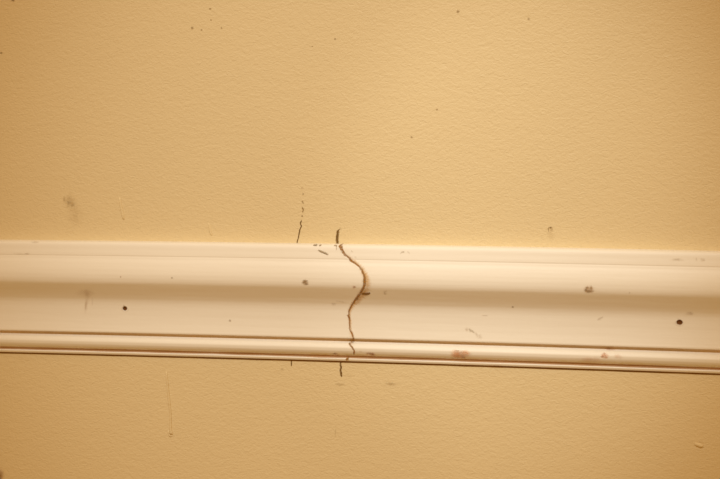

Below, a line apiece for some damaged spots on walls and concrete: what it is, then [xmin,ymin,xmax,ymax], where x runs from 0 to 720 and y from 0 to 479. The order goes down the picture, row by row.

crack [334,229,370,377]